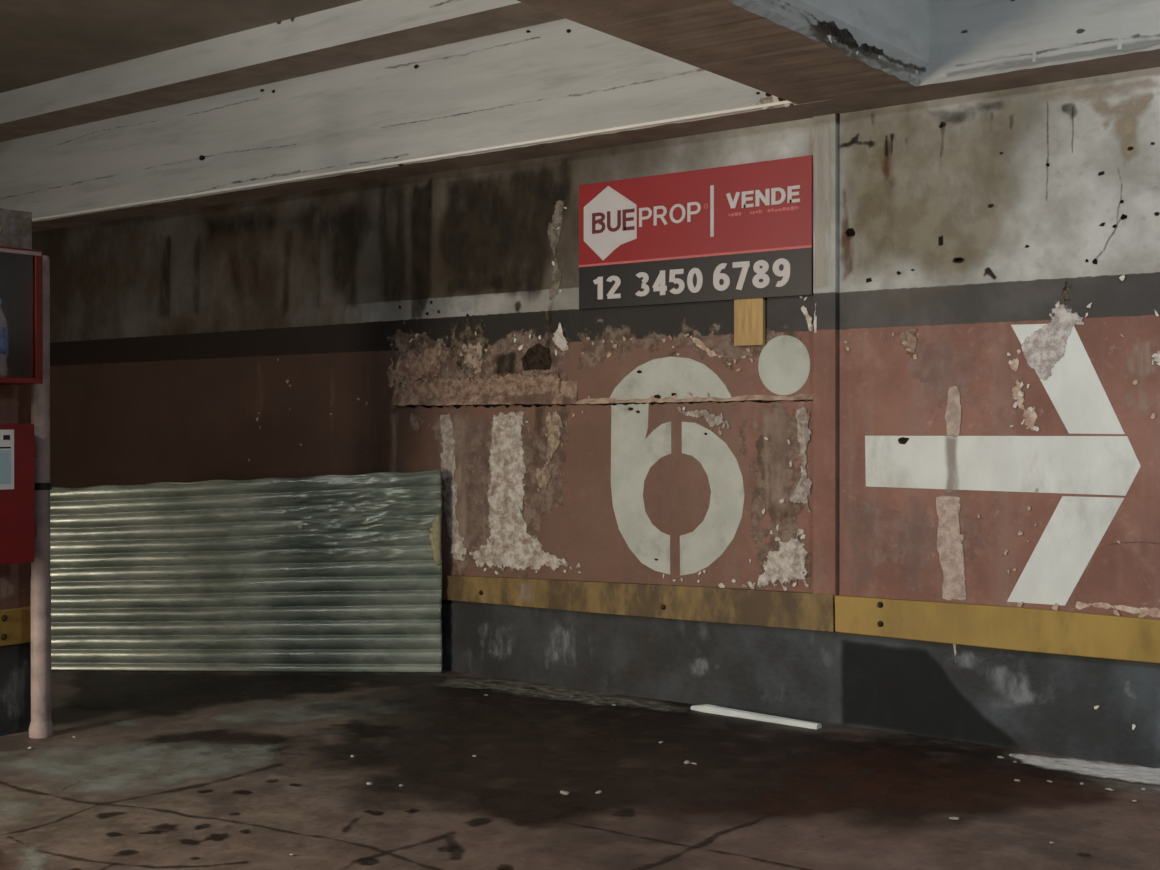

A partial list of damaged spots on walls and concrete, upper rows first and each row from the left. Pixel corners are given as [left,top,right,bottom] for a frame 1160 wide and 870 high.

damp [382,162,569,318]
peeling [387,200,817,408]
damp [840,106,1015,273]
peeling [1007,281,1092,431]
damp [1050,80,1152,158]
crack [1085,200,1127,264]
peeling [410,406,492,576]
peeling [519,406,584,544]
peeling [654,393,813,591]
peeling [936,386,966,600]
crack [0,764,464,870]
crack [527,770,875,870]